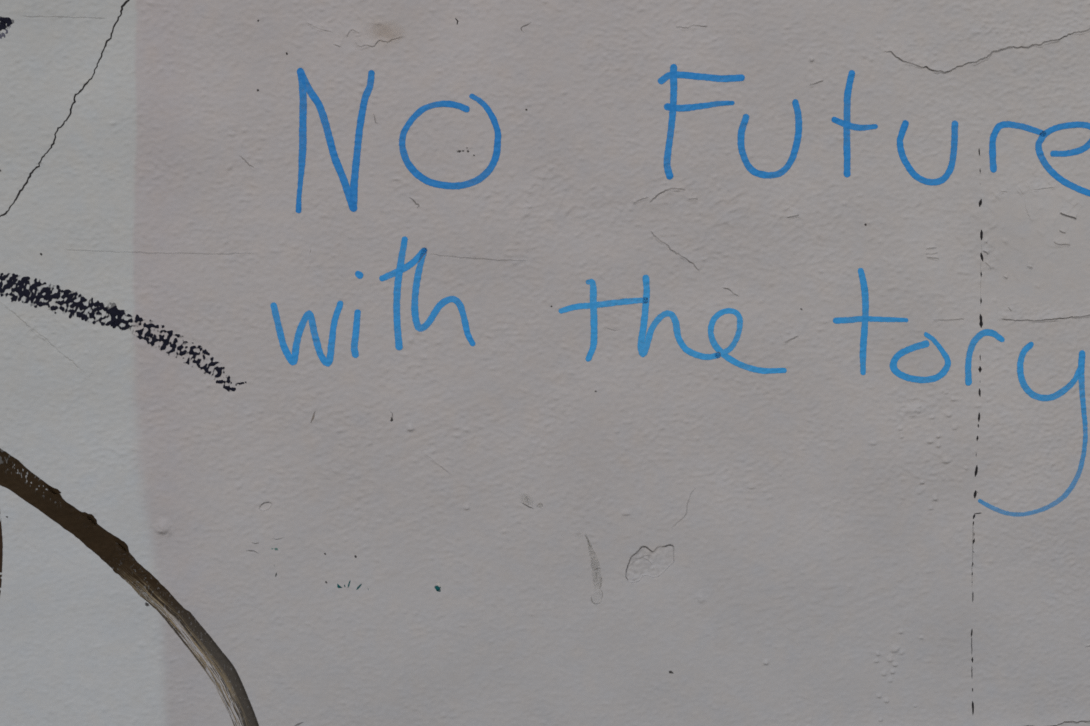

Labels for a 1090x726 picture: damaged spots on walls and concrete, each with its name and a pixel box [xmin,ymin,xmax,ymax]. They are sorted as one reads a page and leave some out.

crack [876,2,1090,74]
crack [0,0,129,216]
crack [931,199,1090,327]
crack [972,466,980,574]